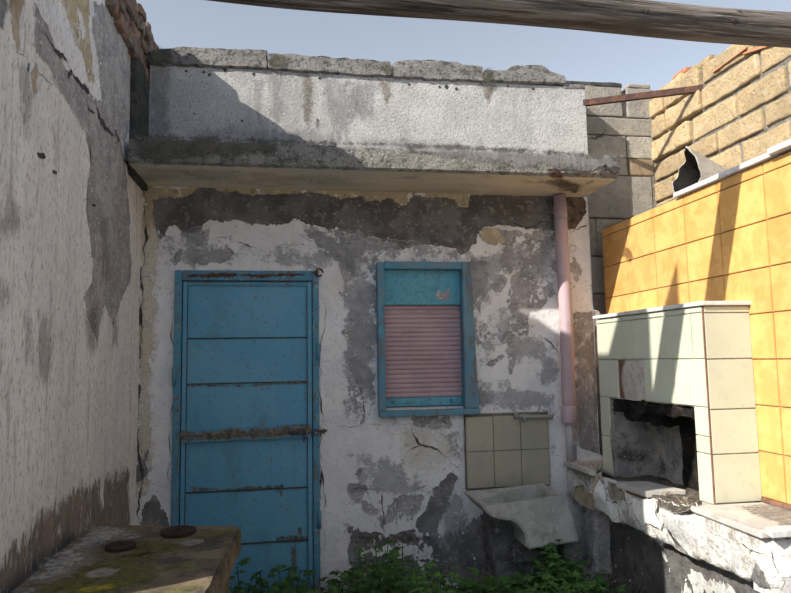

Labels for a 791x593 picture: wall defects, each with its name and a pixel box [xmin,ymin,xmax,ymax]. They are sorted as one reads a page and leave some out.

flaking render [0,0,132,348]
flaking render [566,197,588,231]
crack [136,190,149,519]
flaking render [142,186,557,408]
peeling [569,253,583,291]
peeling [573,310,600,350]
corrosion [178,424,311,443]
crack [349,380,459,469]
water stain [0,468,202,593]
flaking render [347,467,486,593]
flaking render [593,479,698,530]
peeling [681,568,739,593]